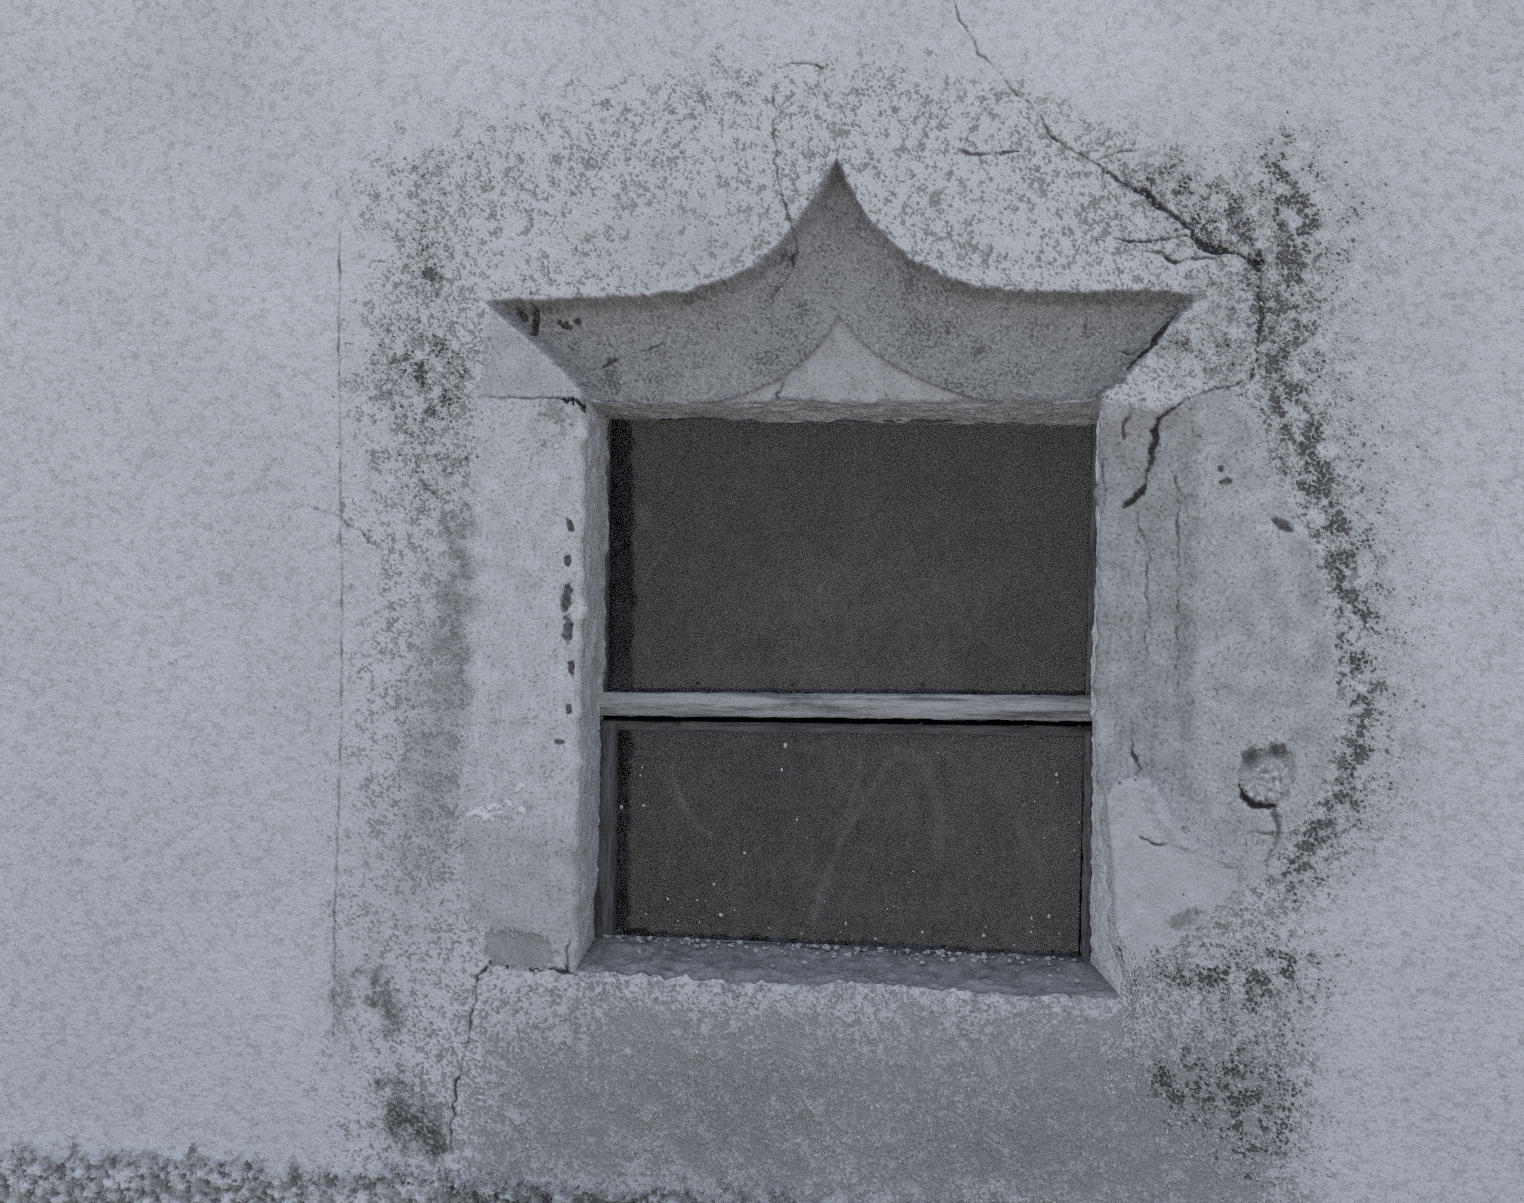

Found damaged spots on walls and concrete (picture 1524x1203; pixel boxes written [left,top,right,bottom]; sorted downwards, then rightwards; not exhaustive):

crack [961,126,1265,598]
spalling [1121,111,1434,1195]
crack [470,947,573,1028]
crack [451,1076,460,1134]
damp [741,1054,1031,1202]